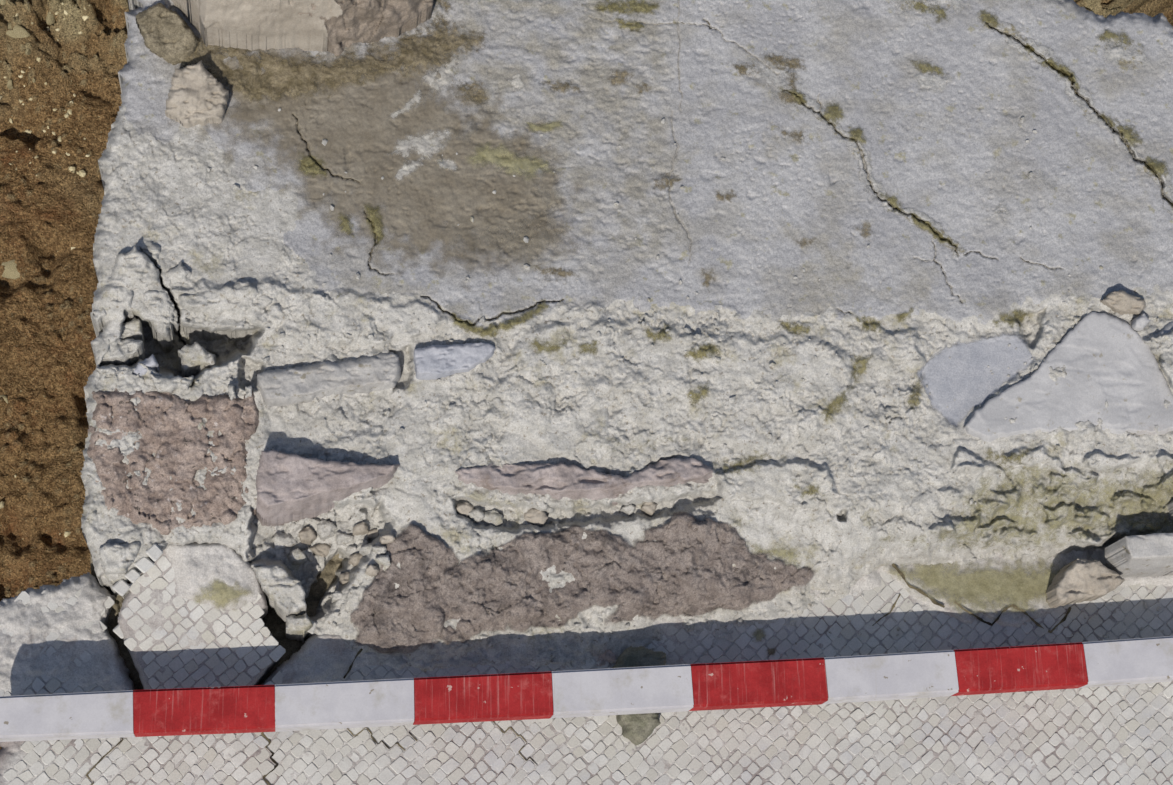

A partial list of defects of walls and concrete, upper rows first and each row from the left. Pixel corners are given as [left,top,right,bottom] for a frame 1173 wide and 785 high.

crack [292,114,384,275]
water stain [210,42,564,268]
crack [681,21,995,297]
crack [980,10,1173,217]
crack [158,268,186,344]
crack [422,296,555,337]
spalling [917,334,1034,426]
spalling [197,581,247,608]
spalling [350,512,814,654]
spalling [1046,559,1125,609]